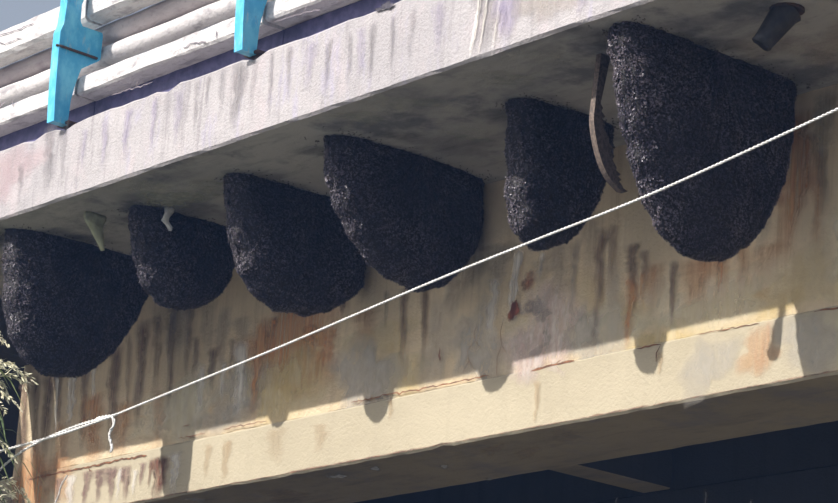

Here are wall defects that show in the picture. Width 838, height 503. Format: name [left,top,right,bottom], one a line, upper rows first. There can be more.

leakage [471,0,488,46]
corrosion [249,312,331,392]
crack [351,322,506,405]
corrosion [85,399,101,443]
corrosion [130,370,838,503]
corrosion [12,453,42,503]
crack [29,455,146,480]